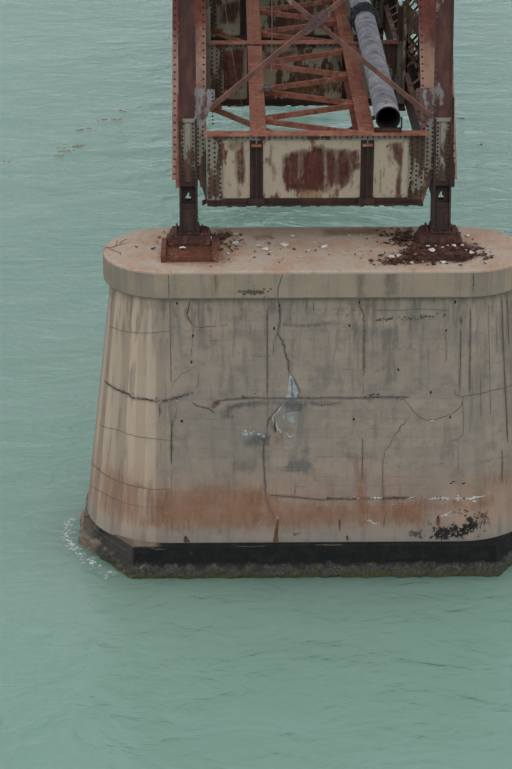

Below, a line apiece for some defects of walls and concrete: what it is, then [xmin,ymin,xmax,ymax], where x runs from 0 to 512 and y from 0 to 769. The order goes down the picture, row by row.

corrosion [224,49,243,90]
corrosion [237,143,245,183]
corrosion [284,147,357,190]
corrosion [385,228,474,264]
crack [273,274,290,372]
spalling [272,375,302,433]
crack [93,316,511,528]
damp [410,509,485,541]